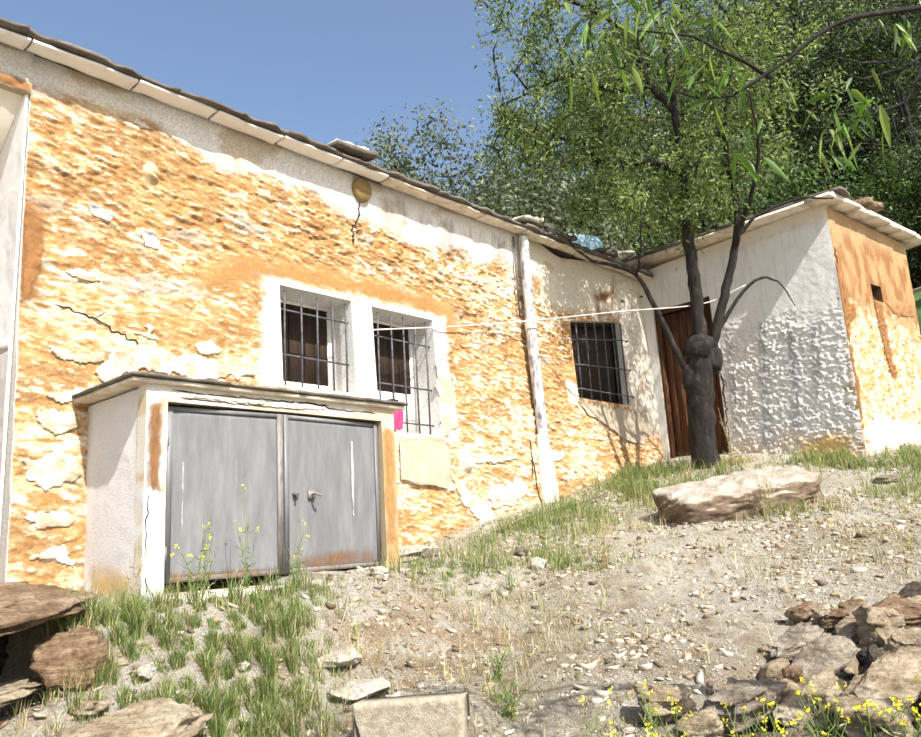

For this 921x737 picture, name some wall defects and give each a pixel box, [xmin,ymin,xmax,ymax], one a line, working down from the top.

crack [54,303,139,345]
flaking render [49,324,256,382]
spalling [836,262,864,429]
flaking render [35,387,85,436]
flaking render [179,392,266,405]
crack [176,390,375,414]
flaking render [564,380,579,406]
flaking render [22,451,81,492]
rust [147,403,162,491]
flaking render [450,472,527,524]
crack [144,496,152,556]
flaking render [29,544,76,567]